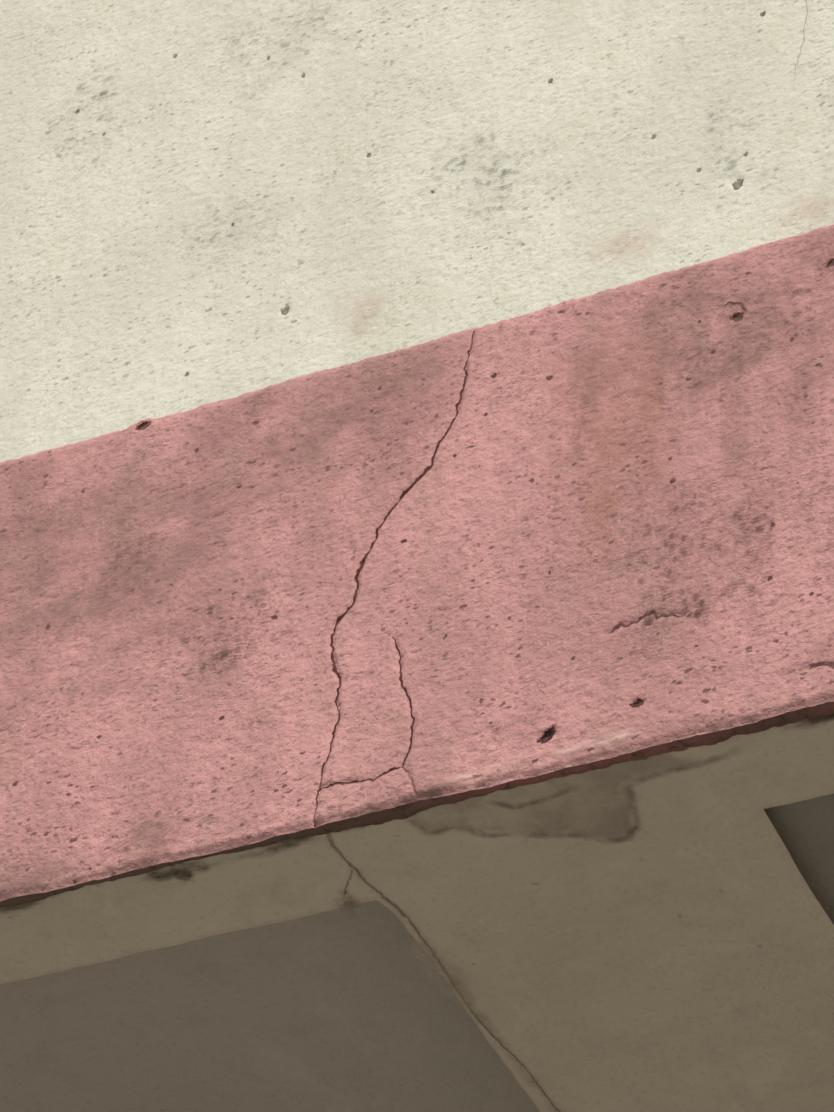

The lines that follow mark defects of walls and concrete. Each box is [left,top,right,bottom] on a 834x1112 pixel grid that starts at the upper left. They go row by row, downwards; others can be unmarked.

crack [793,1,808,90]
crack [313,331,560,1112]